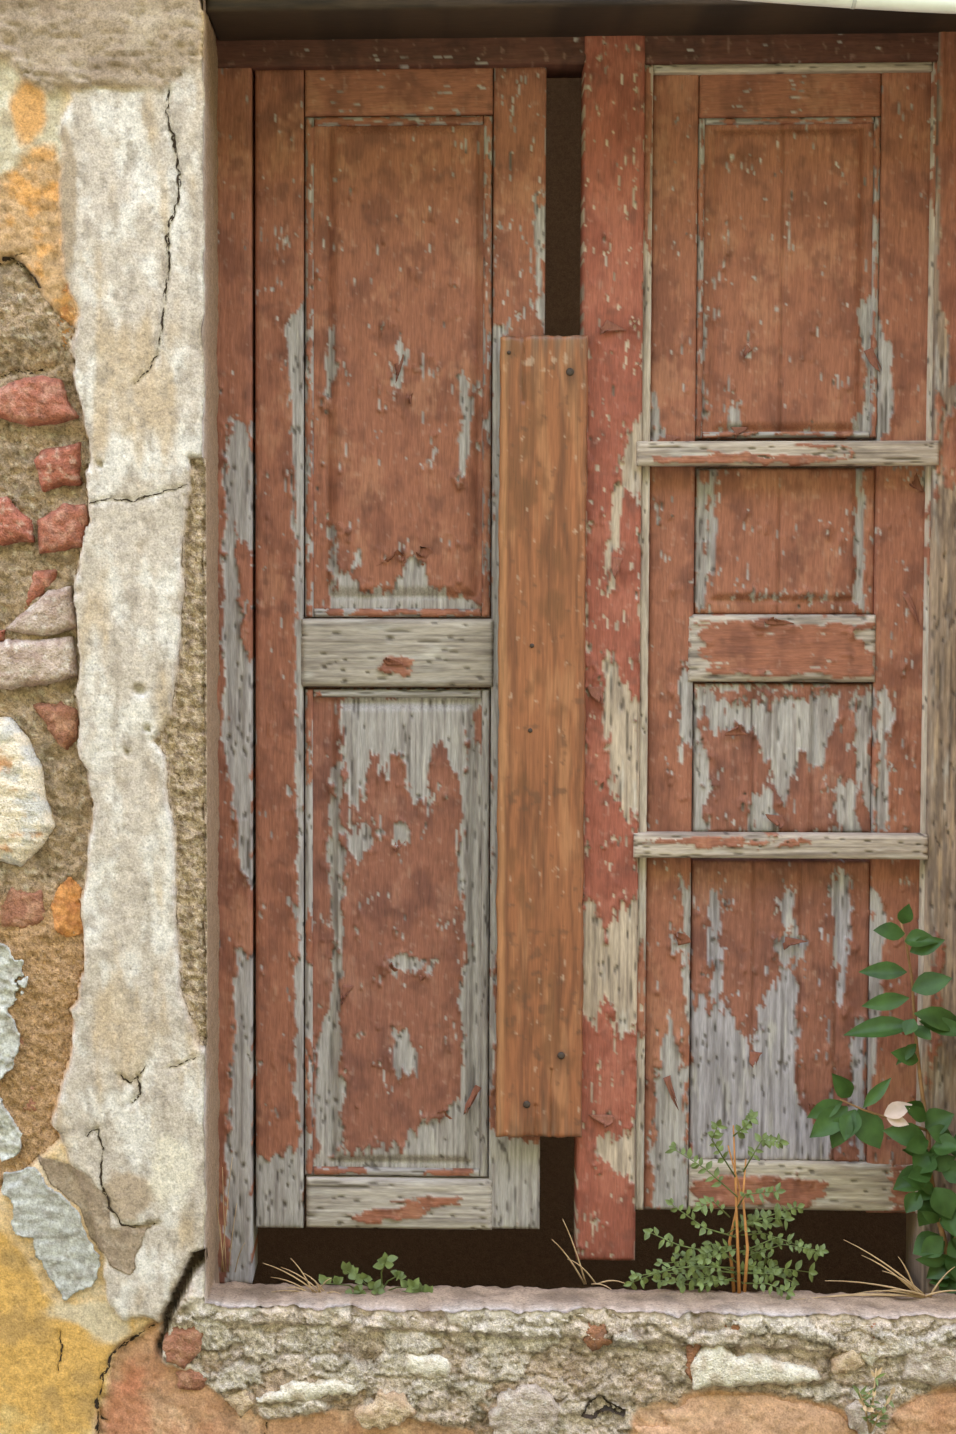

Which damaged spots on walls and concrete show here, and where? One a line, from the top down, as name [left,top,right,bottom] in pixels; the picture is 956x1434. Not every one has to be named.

spalling [0,259,153,1301]